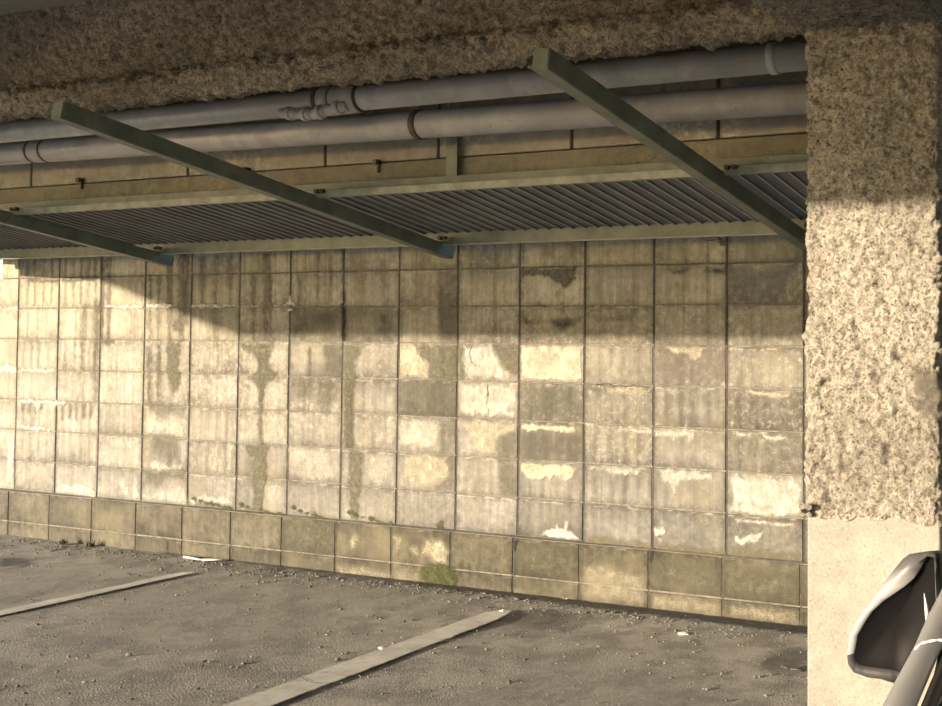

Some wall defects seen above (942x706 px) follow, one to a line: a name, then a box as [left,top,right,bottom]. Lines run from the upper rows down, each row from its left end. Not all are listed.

damp [0,363,55,374]
damp [26,253,286,506]
damp [495,345,518,374]
damp [18,398,71,413]
damp [322,345,361,518]
damp [543,521,577,539]
damp [735,519,790,545]
damp [233,561,808,634]